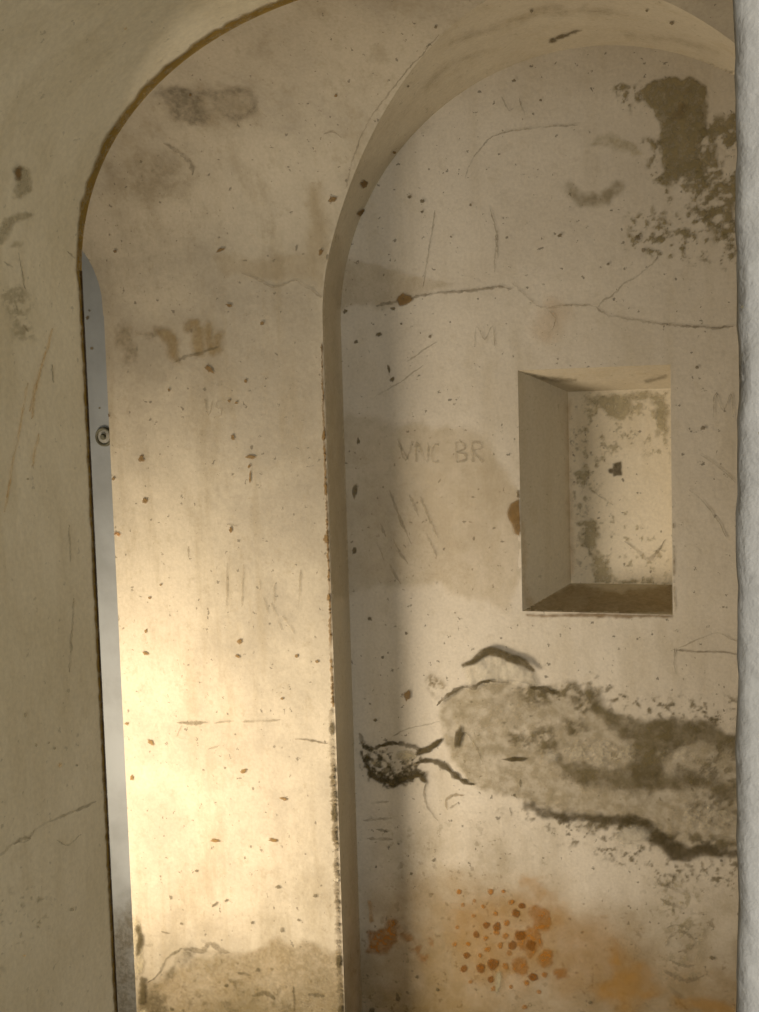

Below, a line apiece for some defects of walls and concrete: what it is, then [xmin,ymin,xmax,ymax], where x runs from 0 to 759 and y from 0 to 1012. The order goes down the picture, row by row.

peeling [615,77,737,264]
peeling [591,393,667,430]
damp [77,0,298,1012]
spalling [609,462,621,476]
peeling [578,521,652,584]
damp [476,681,738,877]
rust [453,889,564,992]